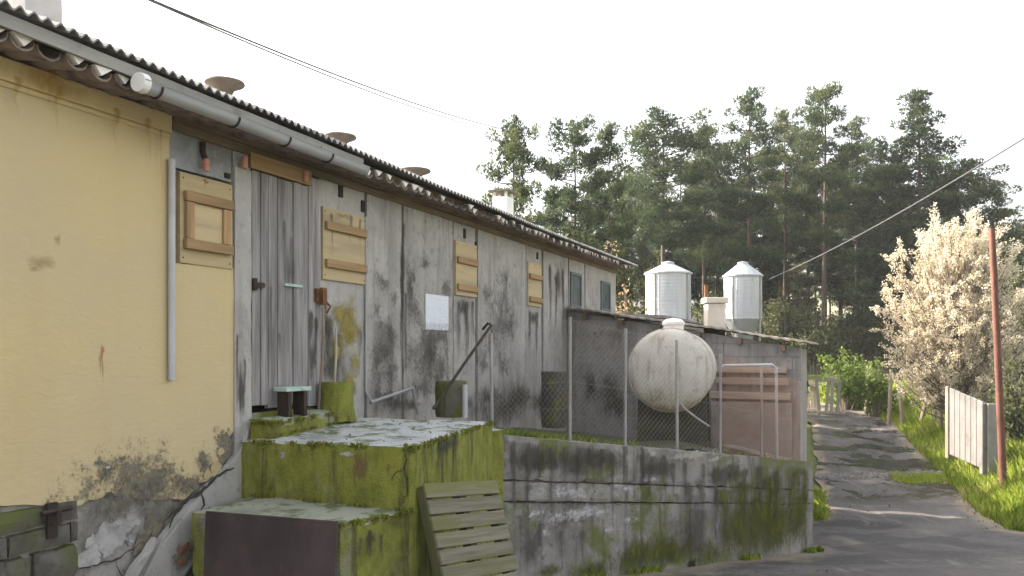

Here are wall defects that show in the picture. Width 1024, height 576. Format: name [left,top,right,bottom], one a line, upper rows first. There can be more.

water stain [374,225,474,409]
water stain [469,389,542,424]
water stain [47,443,211,523]
spalling [78,498,184,570]
crack [80,468,234,576]
water stain [511,441,631,561]